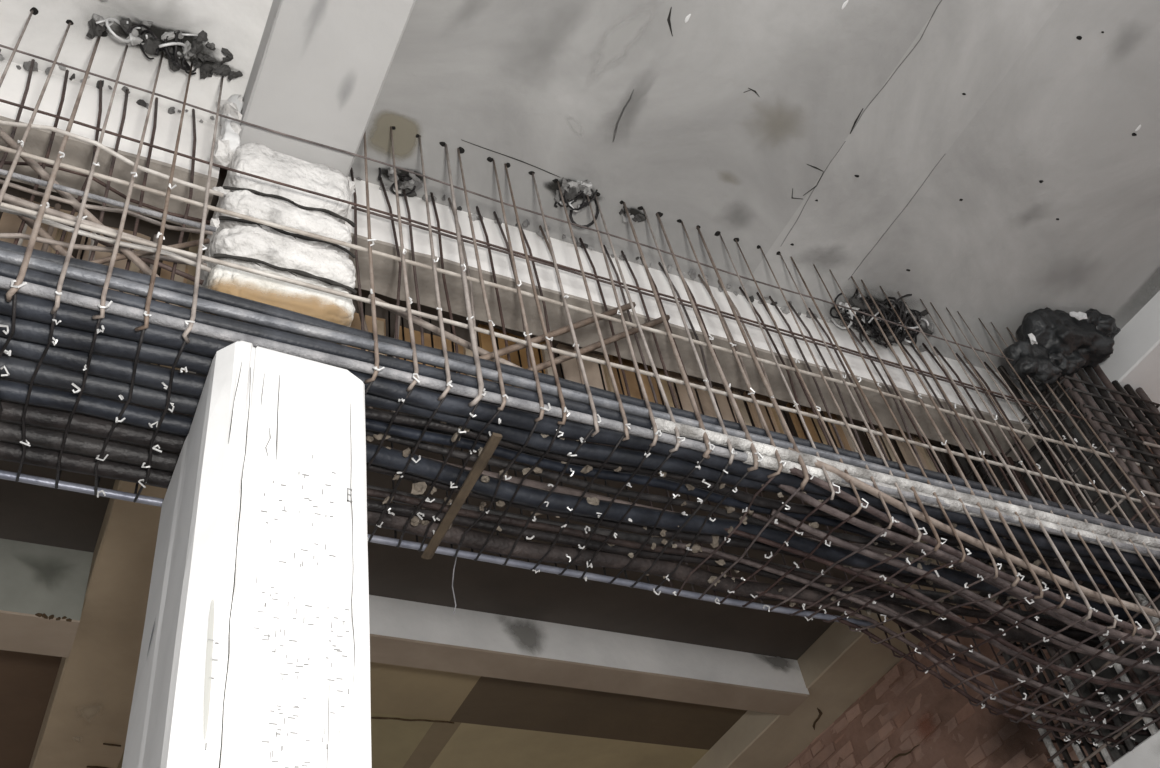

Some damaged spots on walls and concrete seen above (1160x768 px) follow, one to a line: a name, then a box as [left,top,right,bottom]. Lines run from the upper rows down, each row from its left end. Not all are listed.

spalling [0,54,149,109]
spalling [86,0,362,327]
spalling [378,167,502,224]
spalling [516,177,939,356]
spalling [35,613,72,622]
damp [509,623,539,650]